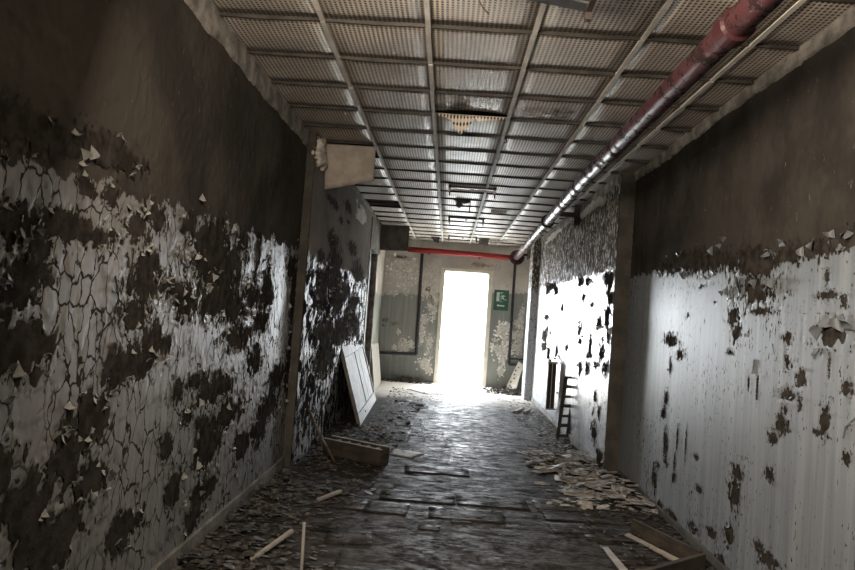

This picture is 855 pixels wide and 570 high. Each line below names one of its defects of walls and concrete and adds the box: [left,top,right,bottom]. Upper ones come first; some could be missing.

spalling [580,196,607,219]
crack [97,276,127,368]
peeling [0,89,298,570]
peeling [302,193,367,384]
peeling [540,262,615,382]
peeling [643,222,855,448]
peeling [652,423,745,565]
peeling [750,537,786,570]